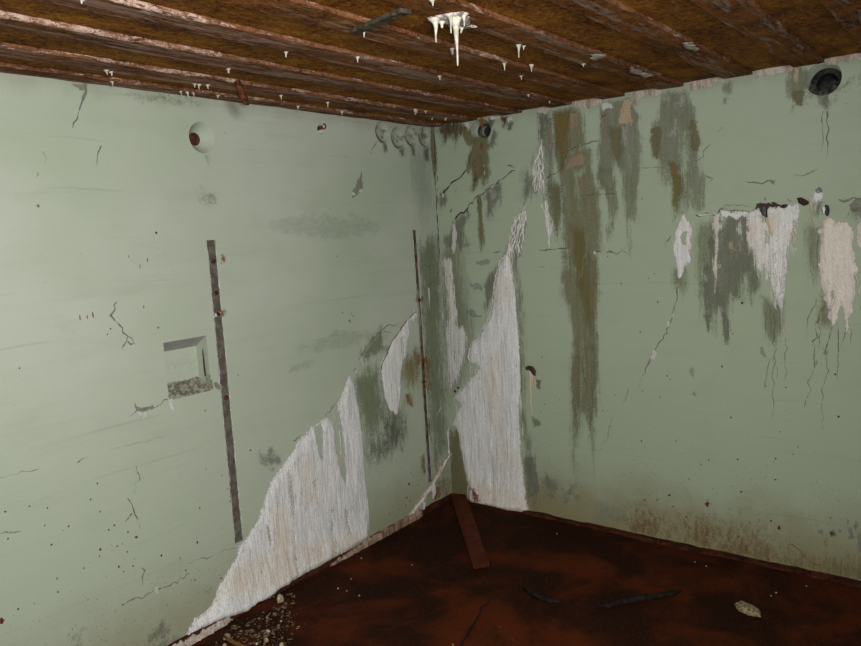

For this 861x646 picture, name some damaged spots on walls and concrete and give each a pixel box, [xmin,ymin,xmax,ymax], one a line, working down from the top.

damp [0,10,231,57]
damp [110,0,235,28]
damp [26,48,251,83]
crack [422,139,516,307]
spalling [756,197,809,217]
corrosion [404,351,431,407]
damp [172,77,724,646]
crack [623,285,679,402]
crack [122,548,236,605]